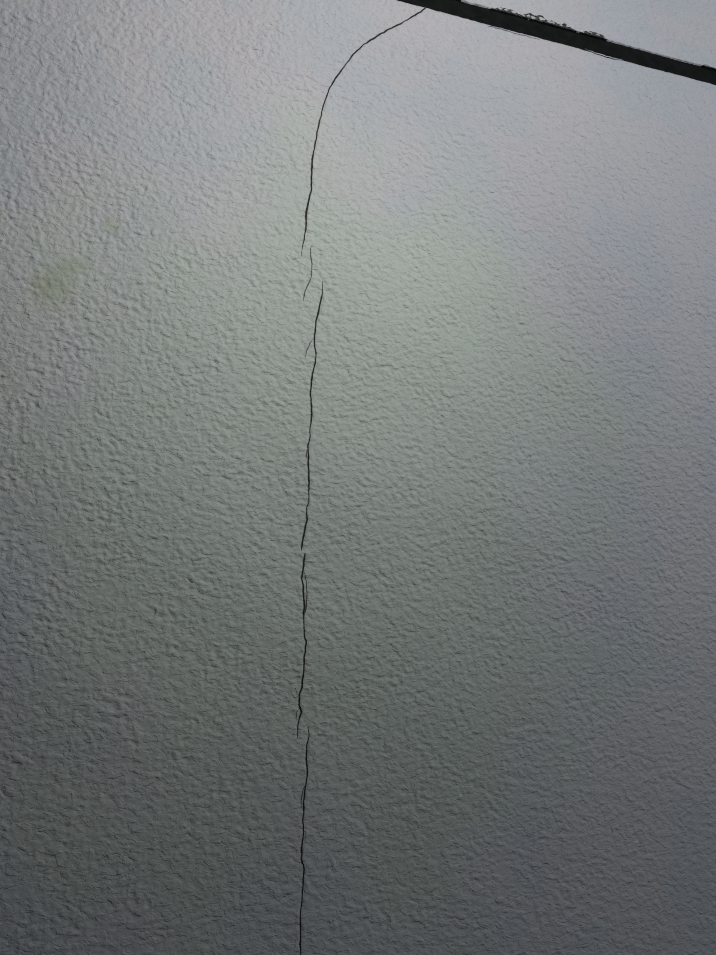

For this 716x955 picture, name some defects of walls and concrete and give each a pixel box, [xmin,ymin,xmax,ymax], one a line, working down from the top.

crack [296,7,427,955]